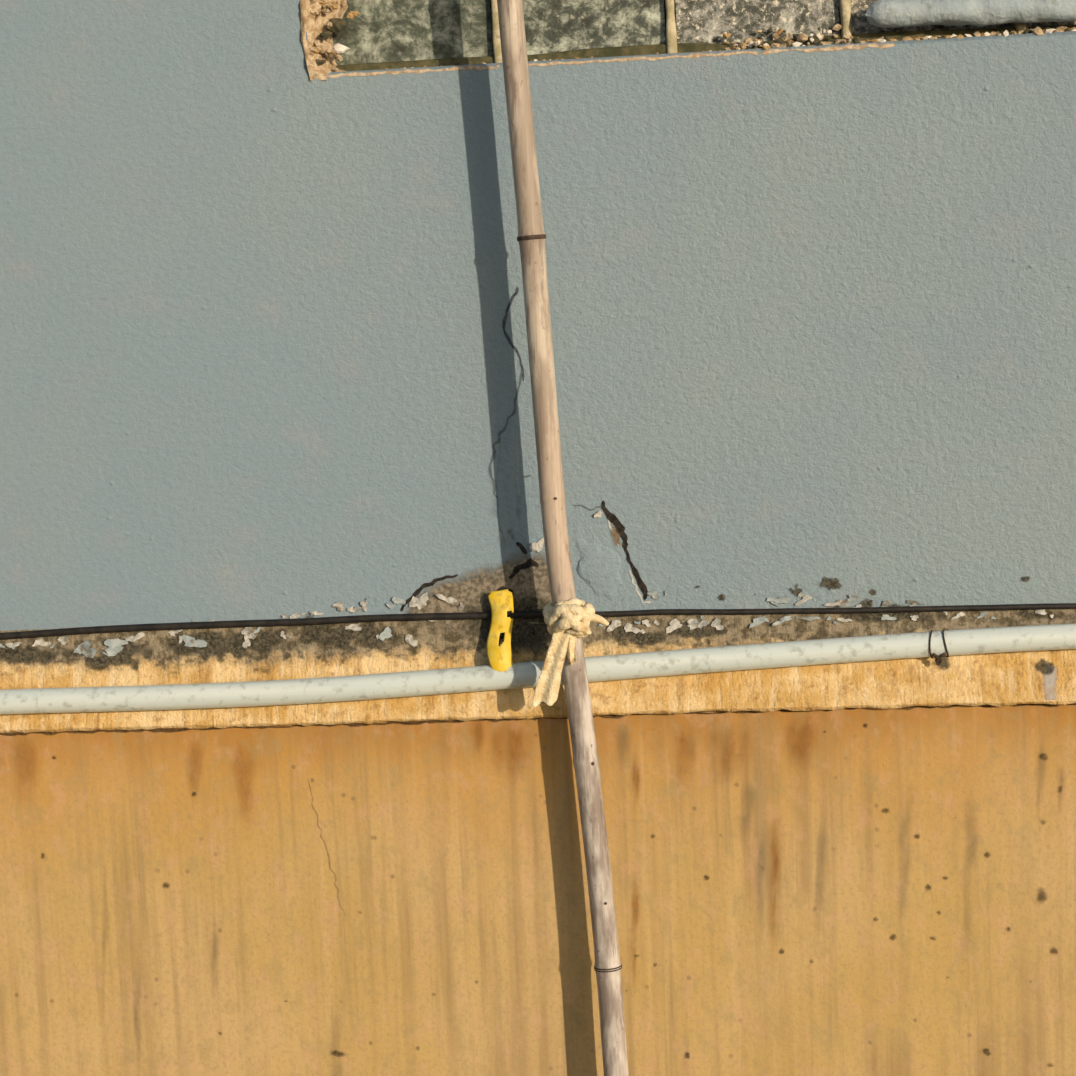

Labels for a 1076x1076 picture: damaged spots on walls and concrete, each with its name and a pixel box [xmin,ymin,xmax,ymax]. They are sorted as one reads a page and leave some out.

crack [489,288,524,499]
crack [574,501,651,603]
flaking render [386,537,552,650]
peeling [0,632,145,658]
damp [0,639,151,670]
peeling [167,620,214,647]
damp [169,629,286,659]
damp [300,616,396,650]
peeling [599,615,724,634]
damp [613,622,727,645]
crack [683,703,1076,714]
crack [0,714,646,736]